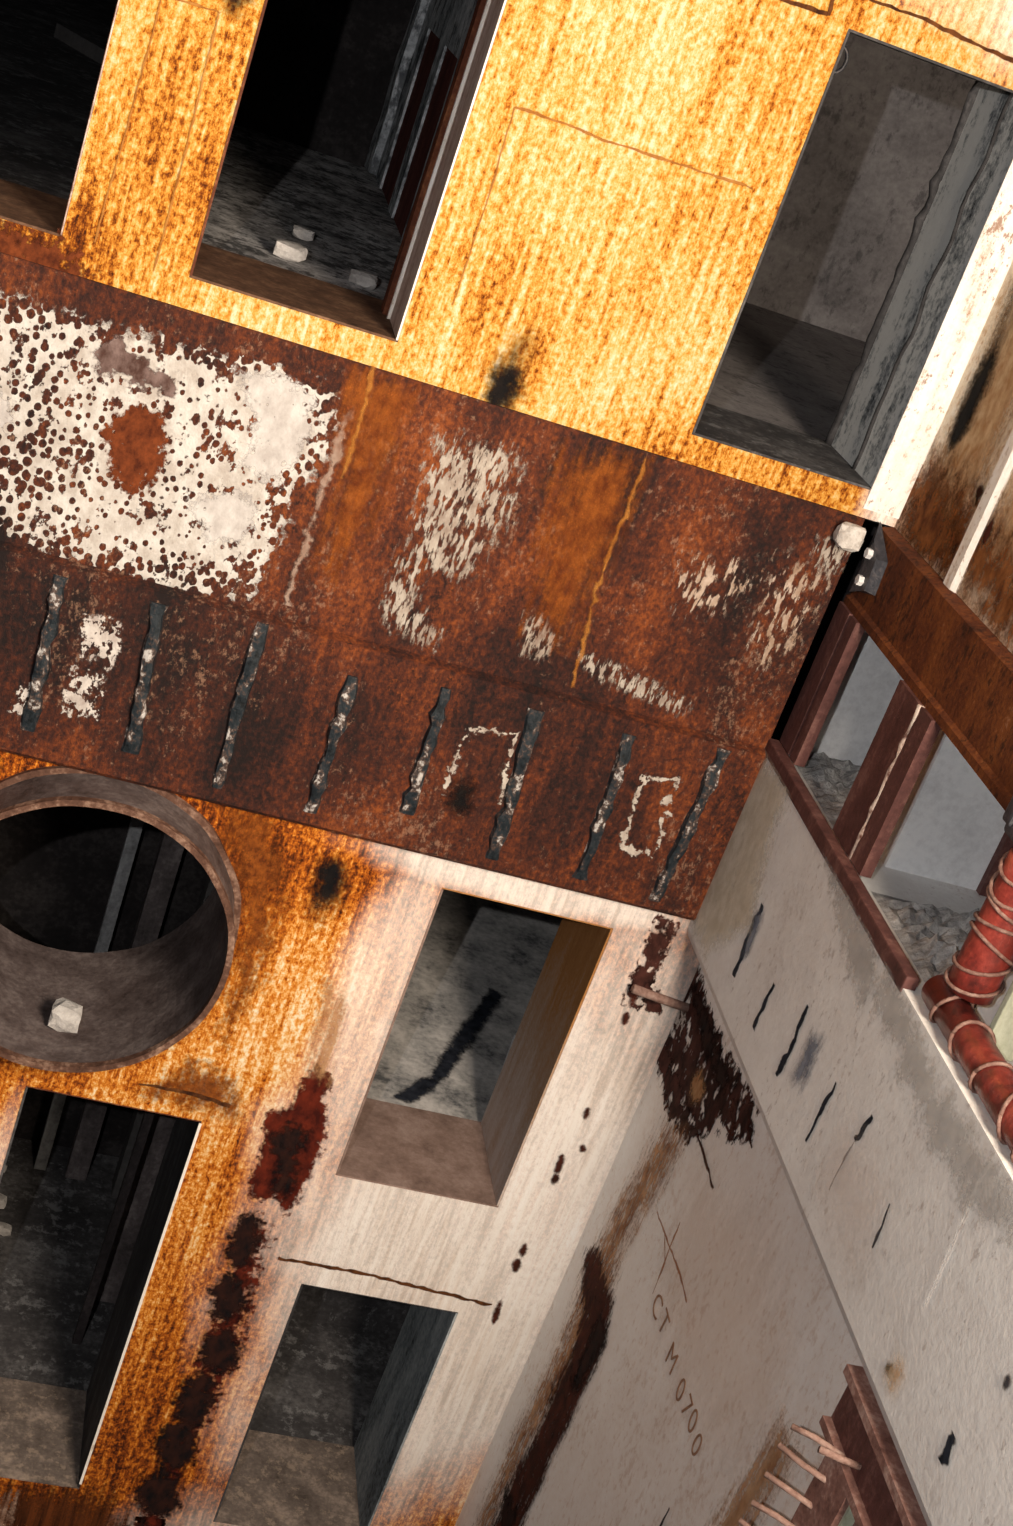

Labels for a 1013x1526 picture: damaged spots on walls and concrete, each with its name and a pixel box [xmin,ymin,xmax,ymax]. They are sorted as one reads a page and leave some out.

crack [781,0,1013,63]
corrosion [94,334,177,496]
peeling [0,291,354,606]
corrosion [326,366,419,575]
peeling [382,434,524,652]
corrosion [529,452,646,686]
corrosion [896,306,1013,653]
corrosion [225,811,285,1024]
corrosion [622,994,636,1025]
corrosion [0,978,345,1526]
corrosion [479,1123,687,1526]
corrosion [713,1417,789,1526]